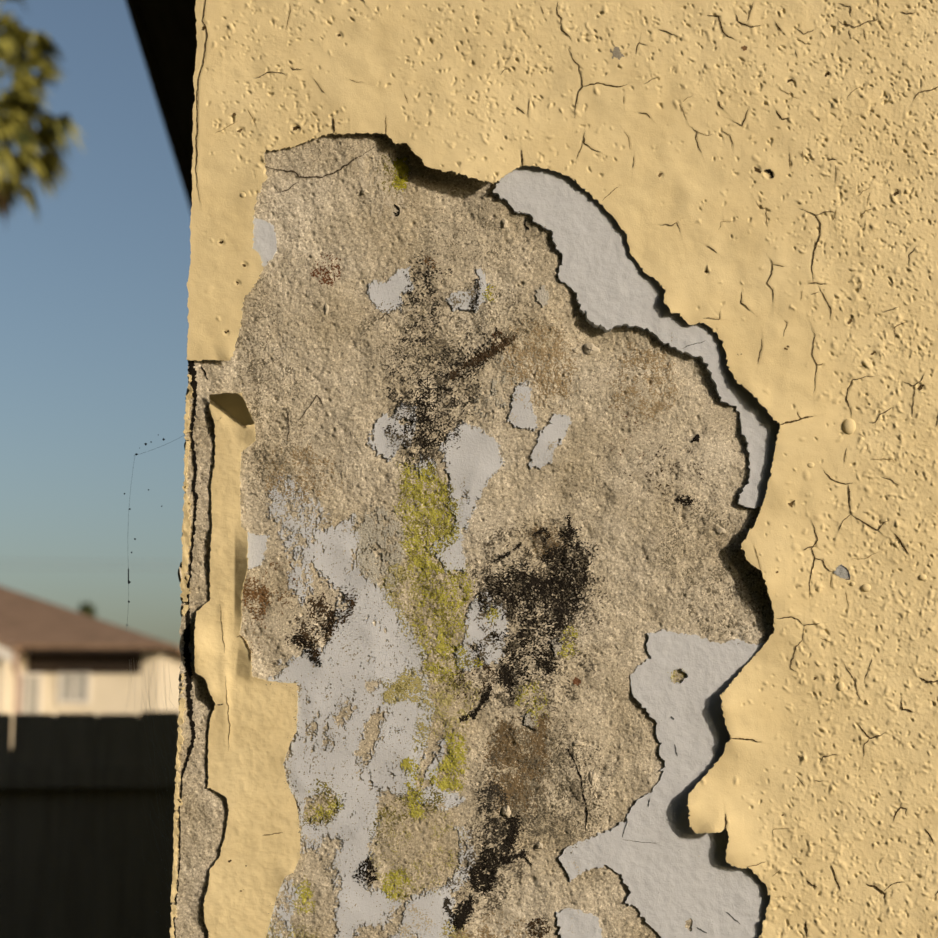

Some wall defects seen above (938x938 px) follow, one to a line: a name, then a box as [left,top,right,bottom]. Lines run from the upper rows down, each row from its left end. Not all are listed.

crack [541,3,658,118]
crack [707,4,813,56]
crack [679,96,748,151]
crack [801,209,836,317]
damp [233,201,585,535]
crack [824,375,924,553]
spalling [170,133,775,938]
crack [804,521,849,606]
crack [173,361,208,938]
damp [374,340,774,938]
crack [777,617,831,672]
damp [352,854,378,891]